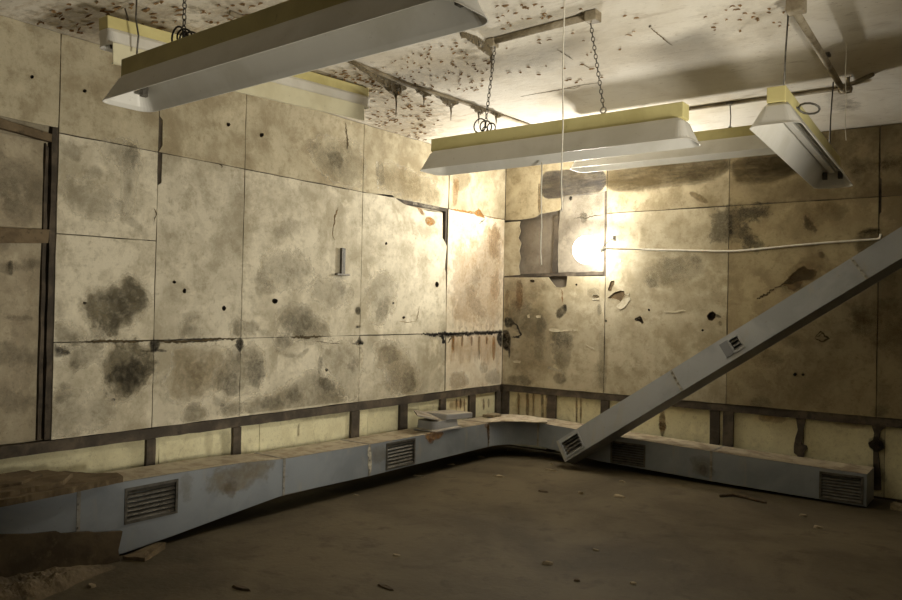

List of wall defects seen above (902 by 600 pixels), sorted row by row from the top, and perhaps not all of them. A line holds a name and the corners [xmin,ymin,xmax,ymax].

water stain [713,203,769,247]
spalling [607,280,631,309]
water stain [86,277,162,397]